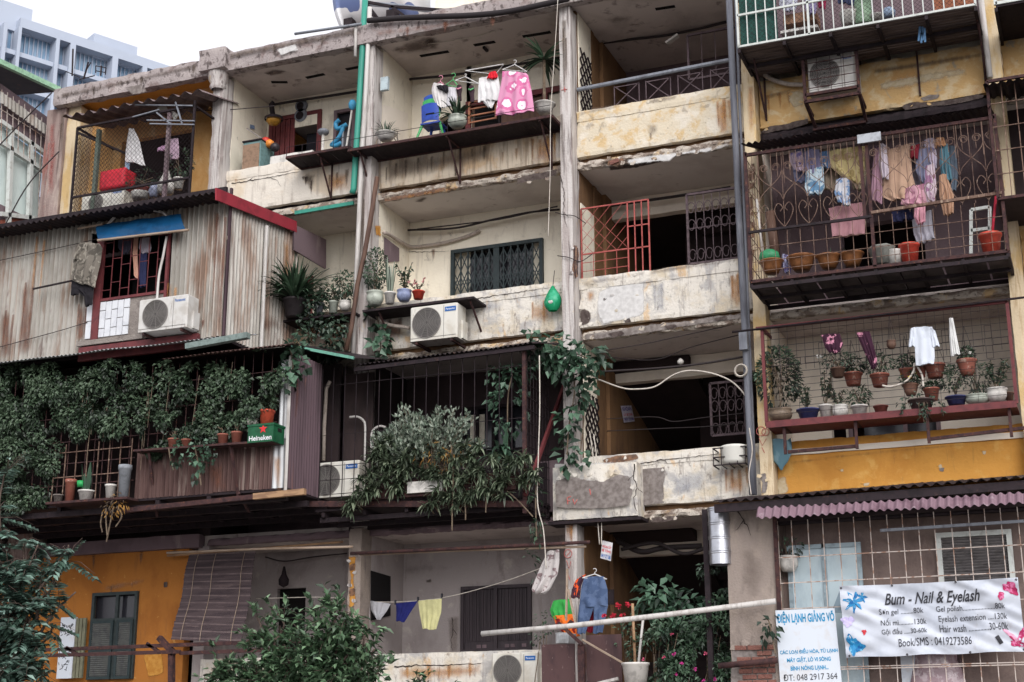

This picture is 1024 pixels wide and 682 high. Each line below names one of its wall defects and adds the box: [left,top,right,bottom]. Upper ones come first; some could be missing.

spalling [607,144,727,170]
rust [2,241,45,350]
peeling [579,273,741,339]
spalling [555,454,678,522]
crack [629,454,715,511]